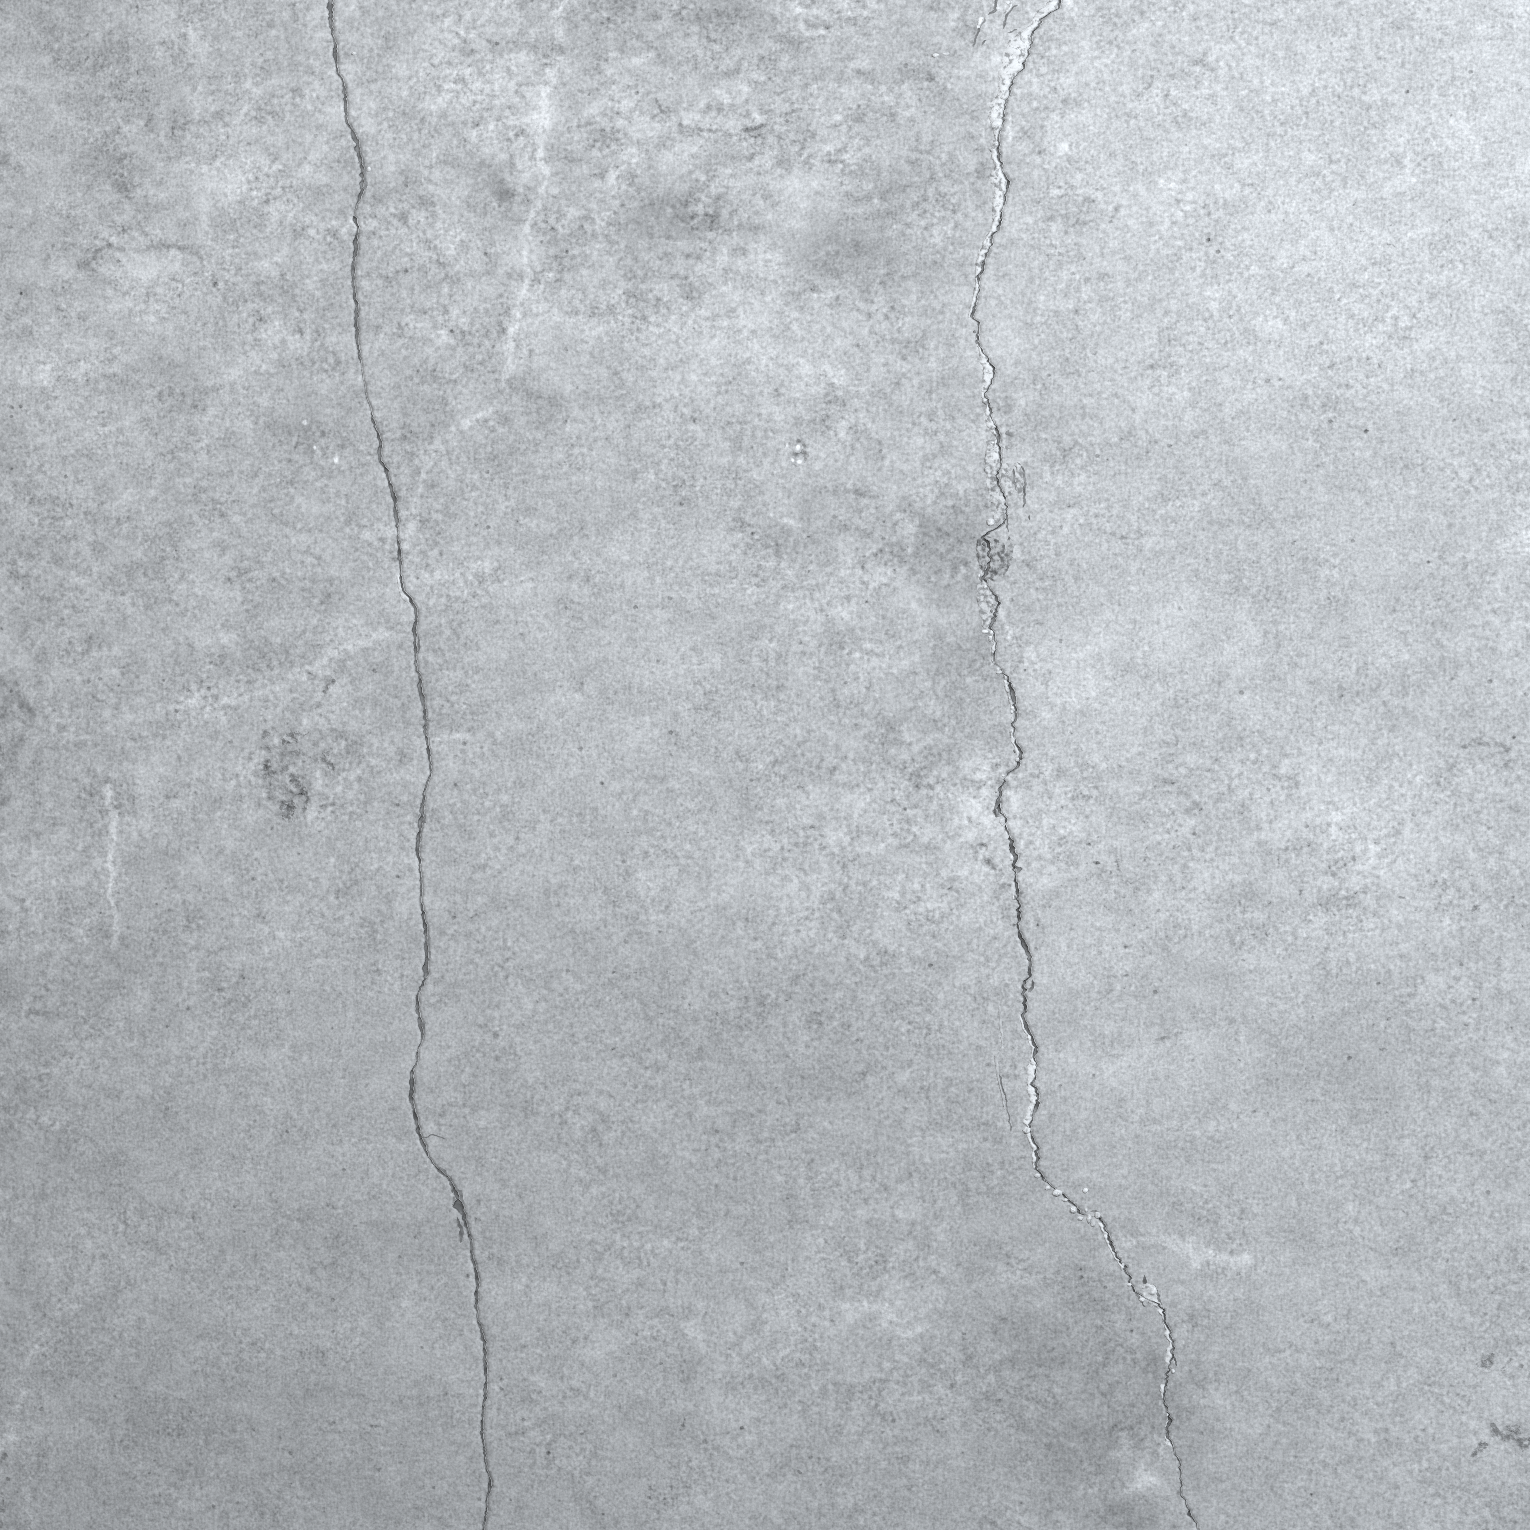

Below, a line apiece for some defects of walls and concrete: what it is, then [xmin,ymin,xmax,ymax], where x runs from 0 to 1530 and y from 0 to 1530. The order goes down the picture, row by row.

crack [326,0,492,1530]
crack [931,0,1199,1530]